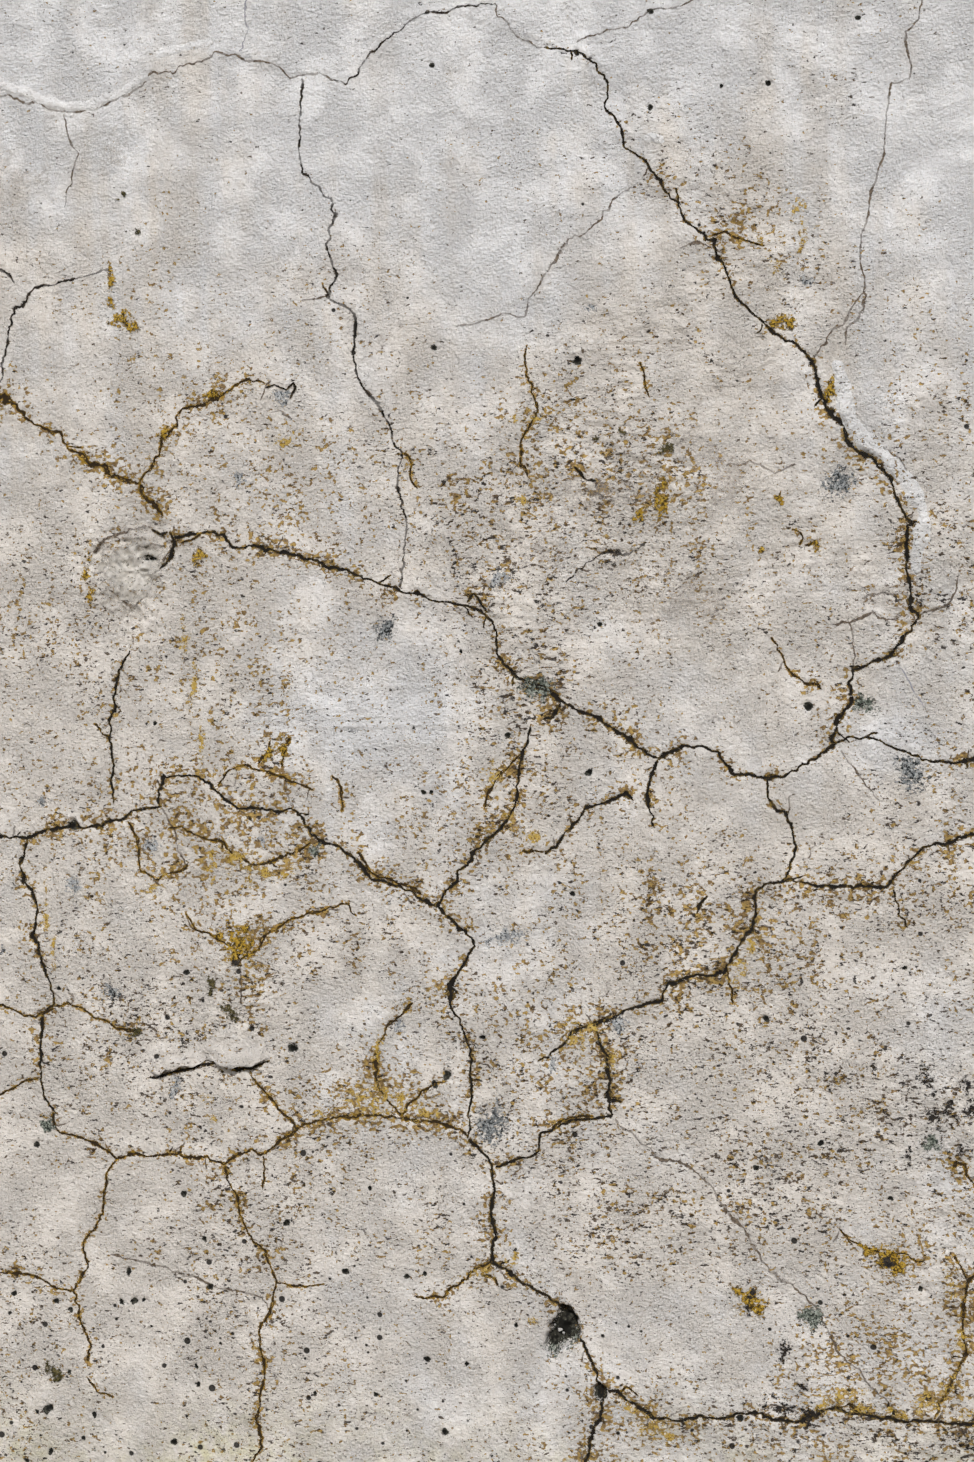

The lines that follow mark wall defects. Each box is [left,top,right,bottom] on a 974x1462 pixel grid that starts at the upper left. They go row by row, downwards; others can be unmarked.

crack [326,3,505,85]
crack [888,0,923,97]
crack [5,94,111,207]
crack [140,0,418,522]
crack [0,268,271,517]
crack [161,46,974,1062]
crack [93,650,131,804]
crack [0,725,622,1462]
crack [637,1140,769,1269]
crack [834,1228,925,1266]
crack [952,1160,974,1188]
crack [577,1255,974,1462]